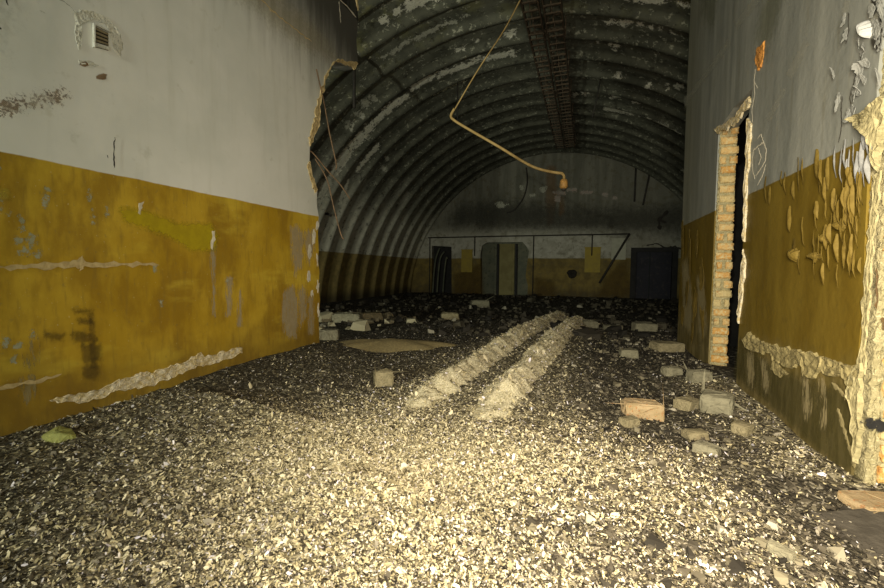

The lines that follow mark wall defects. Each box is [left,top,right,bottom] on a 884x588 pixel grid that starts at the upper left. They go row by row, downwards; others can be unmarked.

spalling [73,9,123,67]
peeling [377,0,439,27]
peeling [0,197,158,273]
peeling [714,0,884,464]
spalling [49,347,242,404]